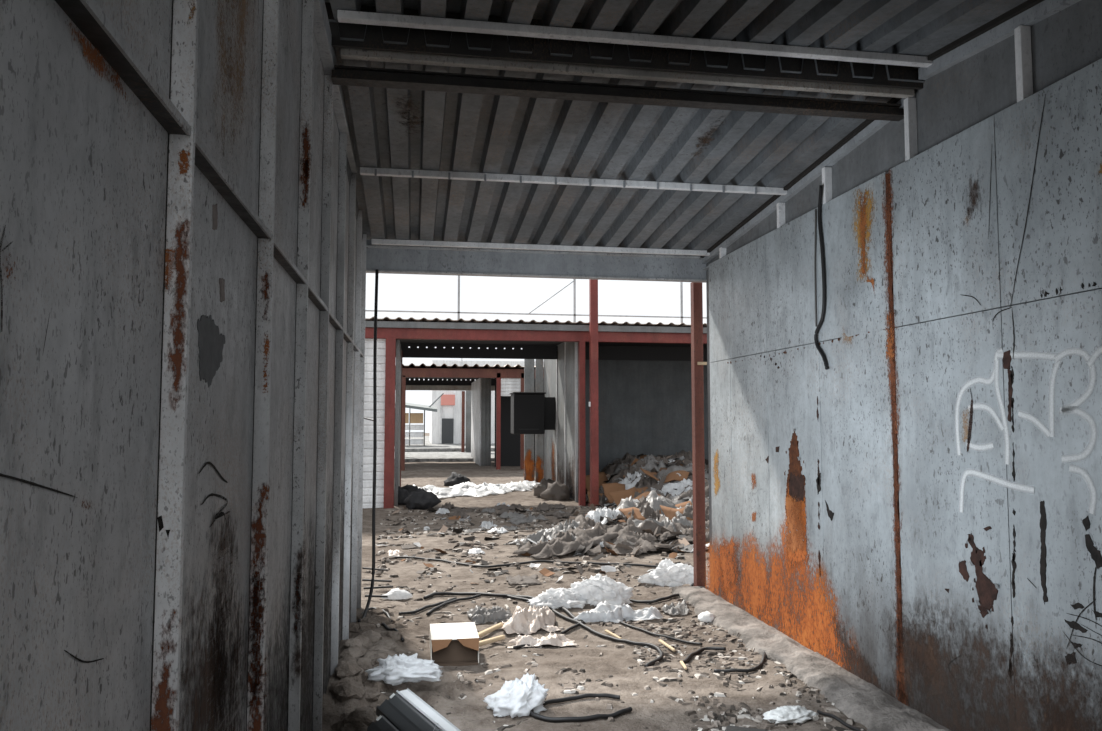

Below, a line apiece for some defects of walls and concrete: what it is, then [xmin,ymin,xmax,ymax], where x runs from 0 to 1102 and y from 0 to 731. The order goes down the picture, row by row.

rust [178,150,190,174]
rust [165,219,190,410]
peeling [1002,350,1014,433]
rust [151,482,353,731]
peeling [958,526,999,629]
peeling [1011,501,1048,604]
peeling [1064,516,1102,666]